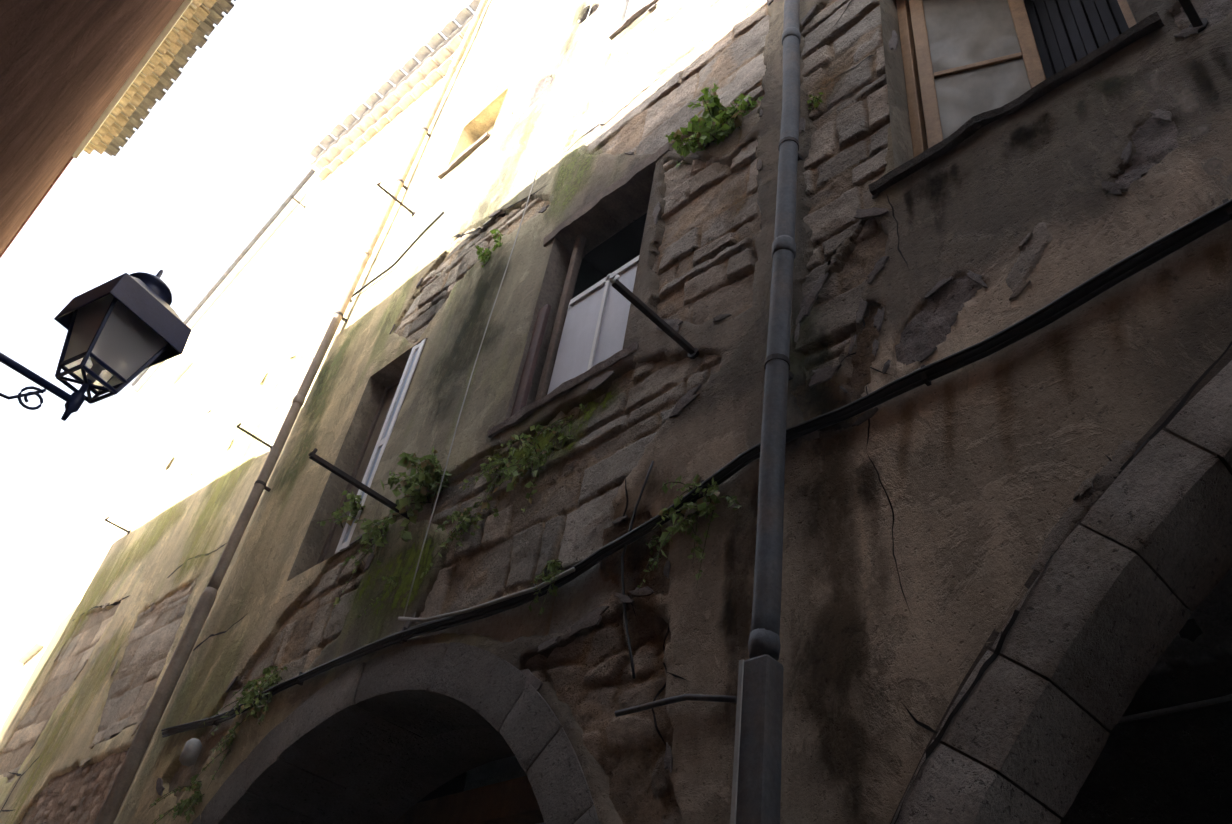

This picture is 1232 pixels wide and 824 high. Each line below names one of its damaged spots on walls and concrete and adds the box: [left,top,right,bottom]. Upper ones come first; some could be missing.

flaking render [1174,0,1232,39]
flaking render [389,198,552,344]
flaking render [794,0,988,394]
flaking render [1006,222,1053,300]
flaking render [1101,109,1179,195]
flaking render [0,578,197,824]
flaking render [156,353,722,824]
water stain [792,331,875,810]